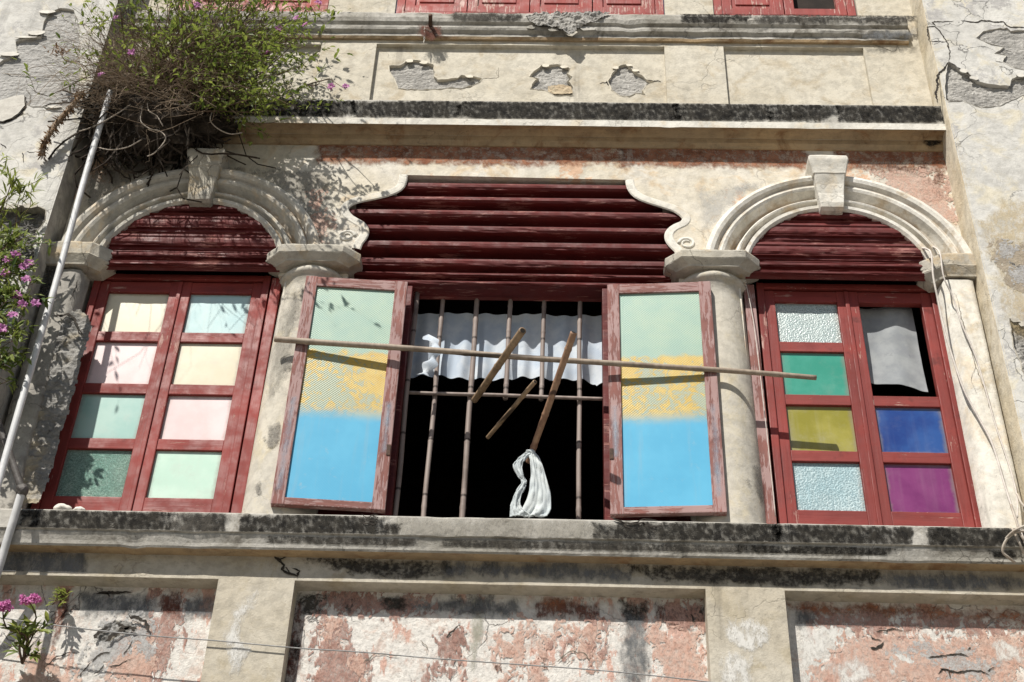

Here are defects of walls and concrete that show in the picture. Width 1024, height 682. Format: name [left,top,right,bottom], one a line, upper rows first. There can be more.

spalling [526,11,610,36]
spalling [0,8,80,123]
spalling [388,59,483,91]
spalling [529,64,574,97]
spalling [600,64,661,97]
spalling [944,27,1024,108]
leakage [228,99,943,122]
leakage [19,510,1024,558]
crack [274,557,300,577]
leakage [307,558,1024,590]
peeling [18,608,162,682]
peeling [797,608,1024,682]